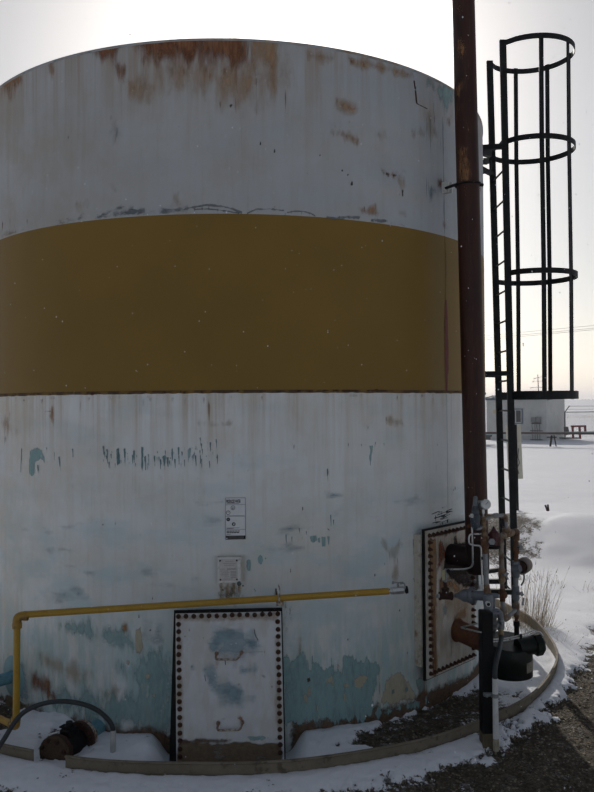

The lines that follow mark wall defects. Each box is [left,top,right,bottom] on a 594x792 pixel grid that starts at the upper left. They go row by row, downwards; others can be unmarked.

rust [96,48,118,60]
rust [143,41,275,66]
peeling [20,447,61,476]
peeling [102,438,218,470]
rust [430,532,459,675]
peeling [55,616,172,731]
peeling [283,652,429,725]
rust [291,663,479,742]